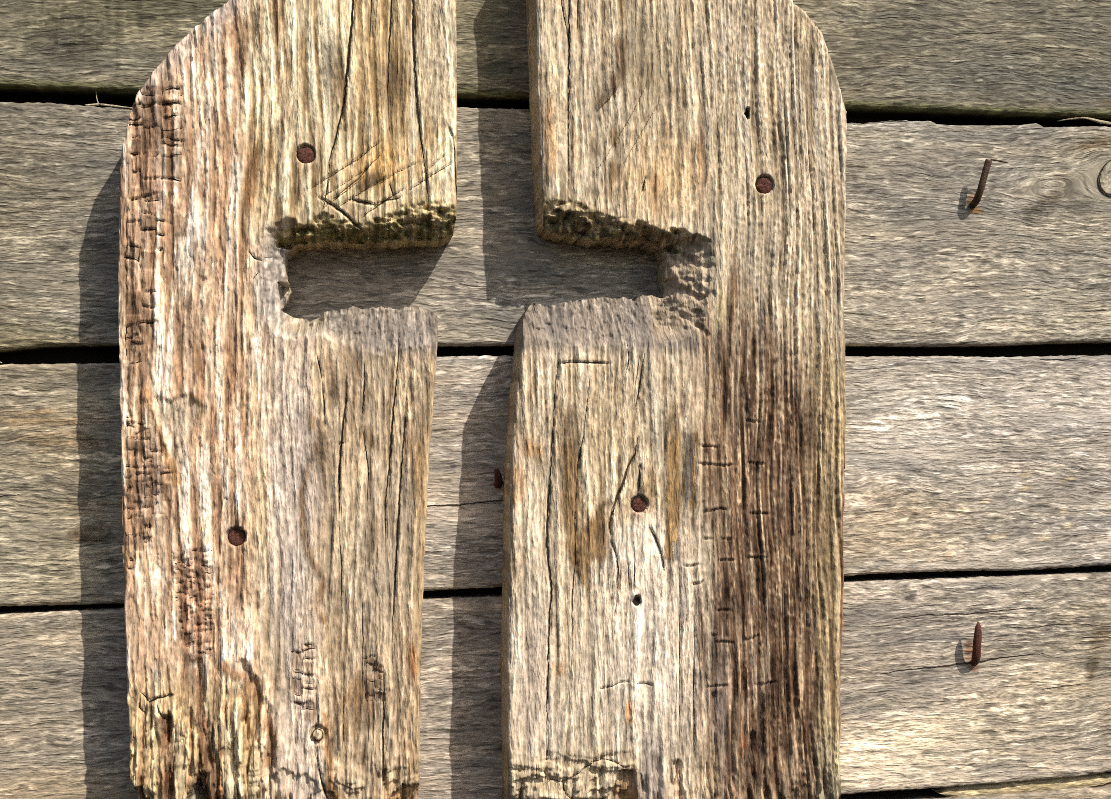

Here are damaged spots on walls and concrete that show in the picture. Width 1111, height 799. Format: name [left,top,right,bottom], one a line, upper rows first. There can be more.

crack [320,0,429,232]
damp [730,264,738,322]
crack [293,337,407,799]
crack [536,343,645,799]
damp [703,326,825,799]